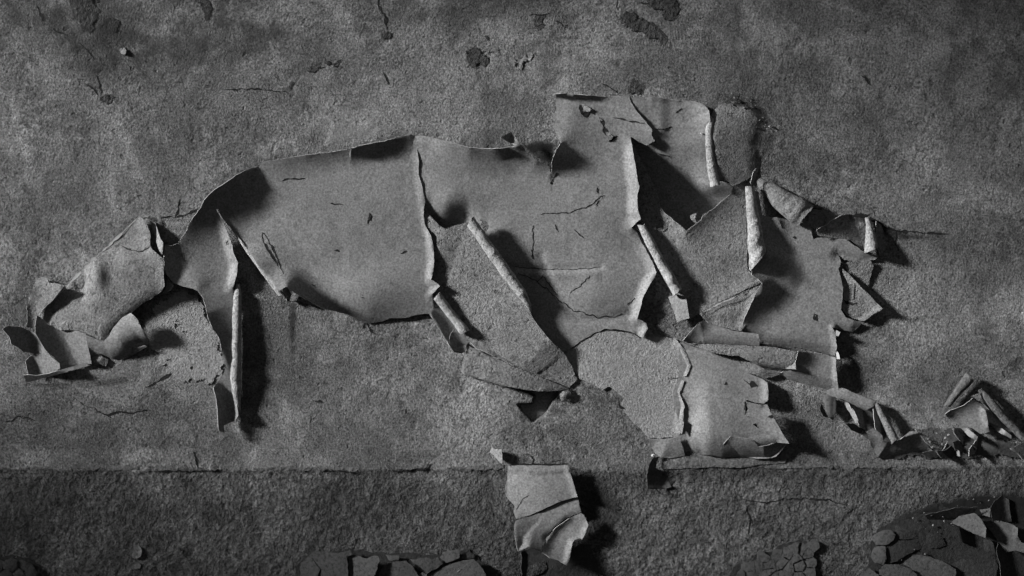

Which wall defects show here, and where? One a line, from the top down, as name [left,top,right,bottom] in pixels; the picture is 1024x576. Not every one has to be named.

peeling [3,79,1024,489]
peeling [490,446,598,576]